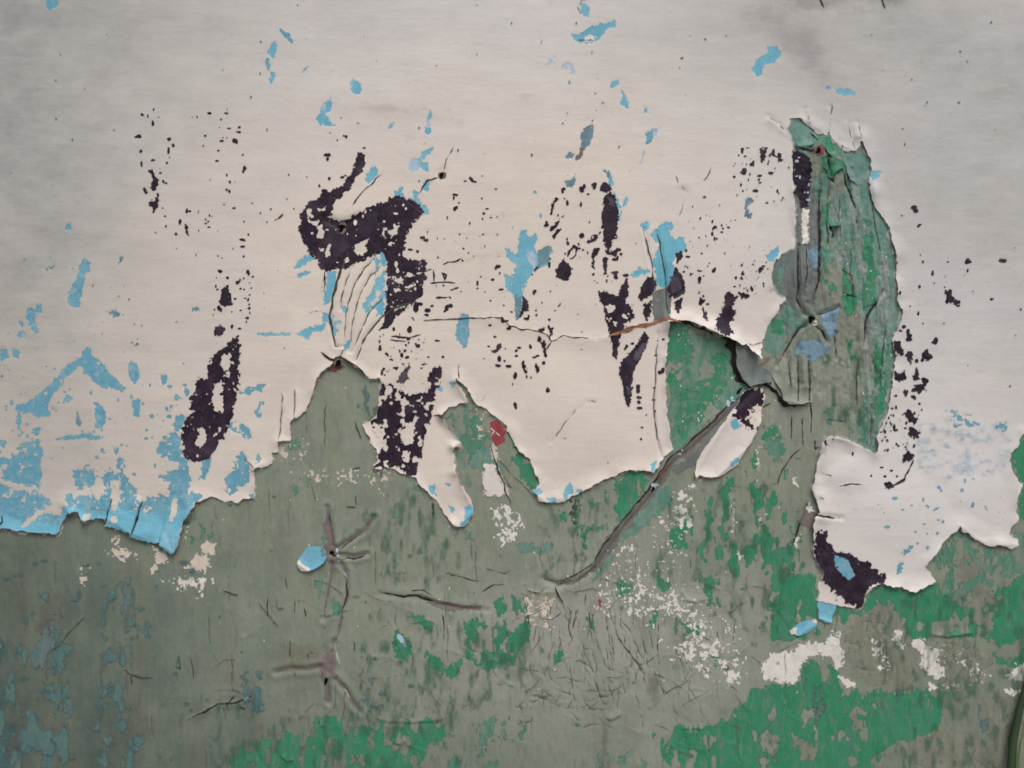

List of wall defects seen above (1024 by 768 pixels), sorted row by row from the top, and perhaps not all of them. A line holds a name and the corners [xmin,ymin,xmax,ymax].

peeling [0,414,213,554]
peeling [128,361,139,385]
peeling [131,399,141,417]
peeling [224,384,301,498]
crack [224,106,886,757]
rust [609,317,682,336]
peeling [362,119,1024,679]
peeling [297,532,344,616]
peeling [0,620,73,768]
peeling [226,670,466,768]
peeling [472,715,526,768]
peeling [652,659,943,768]